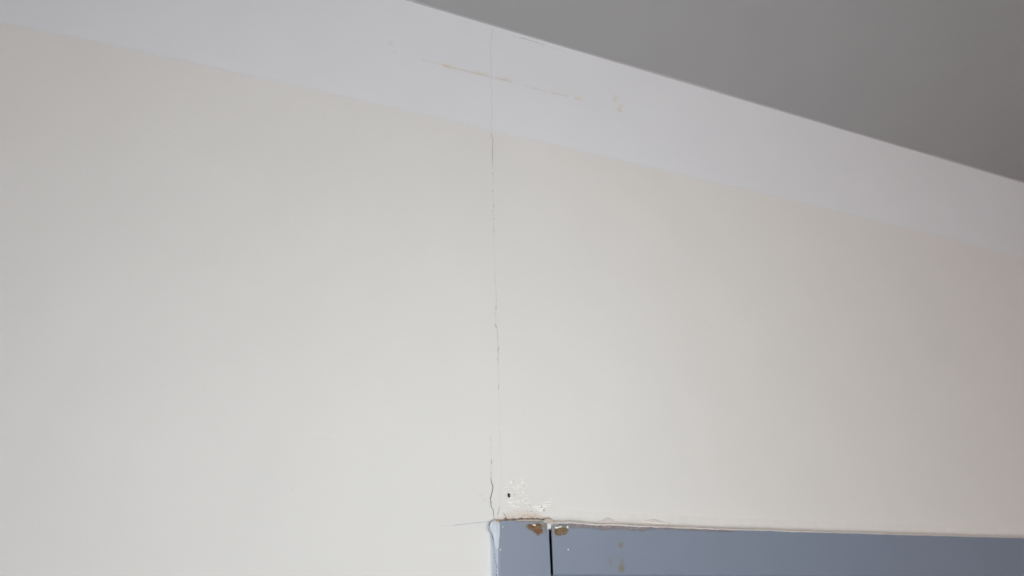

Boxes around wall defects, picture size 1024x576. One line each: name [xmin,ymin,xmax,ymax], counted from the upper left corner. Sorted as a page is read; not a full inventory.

rust [518,520,568,535]